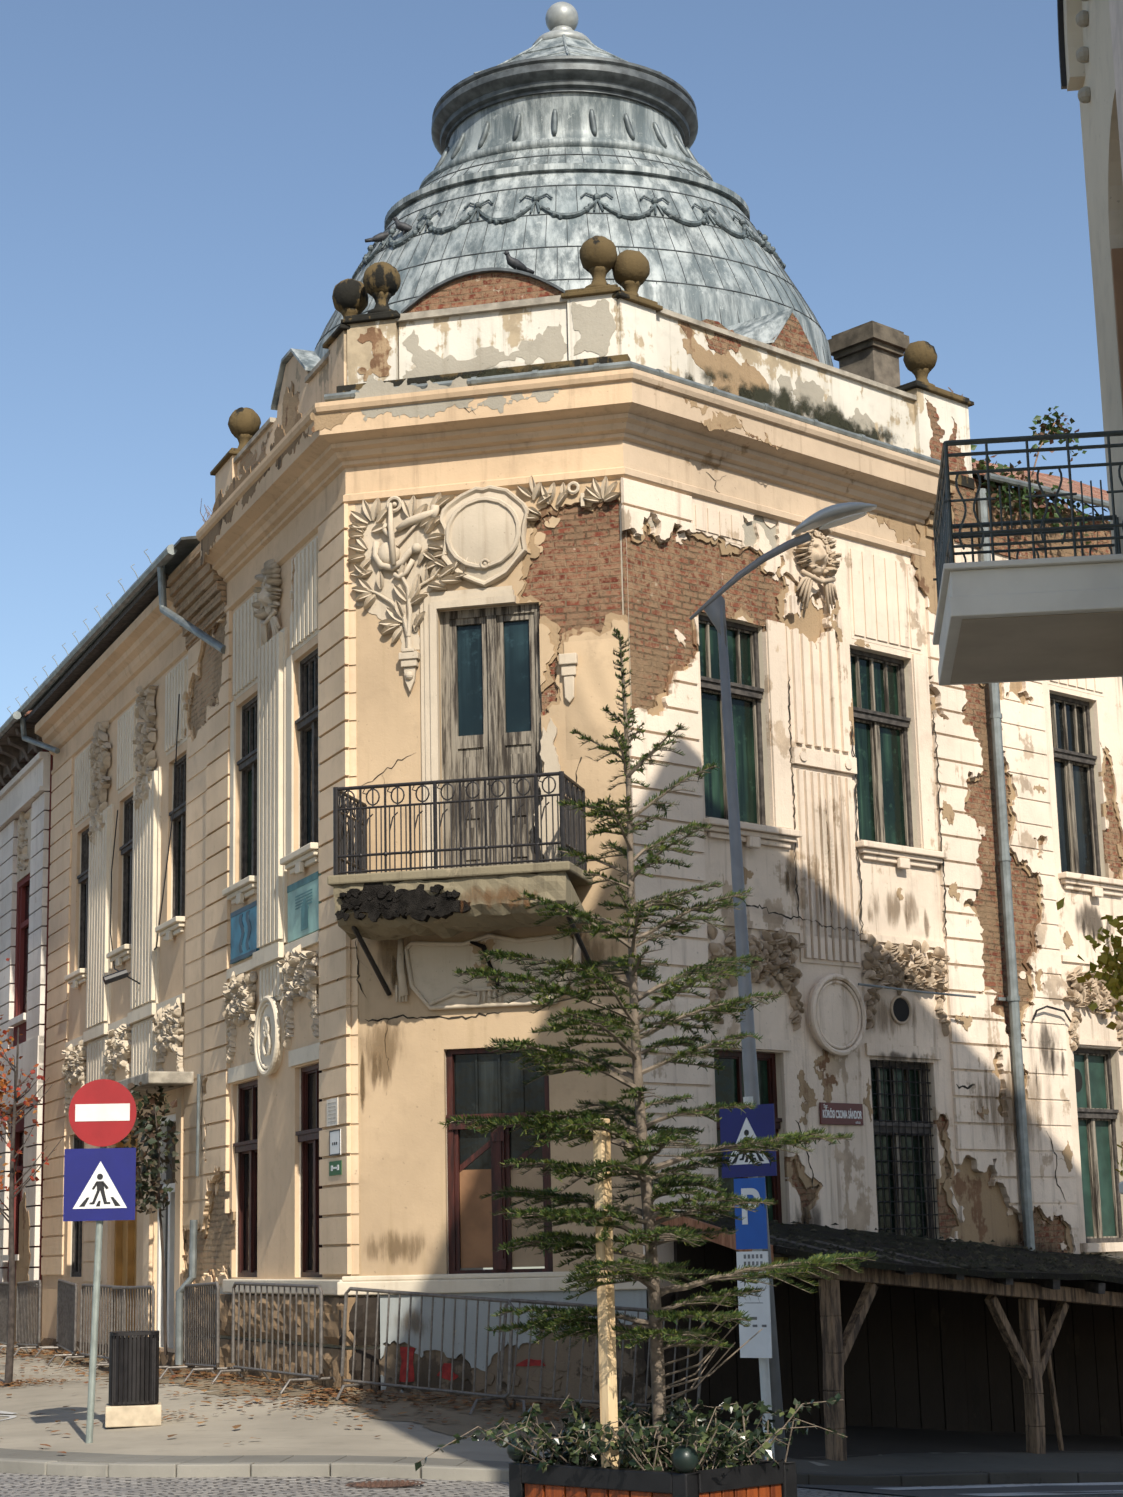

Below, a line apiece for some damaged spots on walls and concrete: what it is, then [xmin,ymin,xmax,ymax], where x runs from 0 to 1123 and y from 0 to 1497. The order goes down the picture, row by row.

peeling [357,298,617,381]
peeling [678,319,875,435]
flaking render [518,498,871,716]
flaking render [942,682,1044,1038]
flaking render [1098,748,1123,880]
spalling [977,1052,1003,1120]
flaking render [184,1171,236,1284]
flaking render [784,1152,822,1224]
spalling [933,1114,1073,1253]